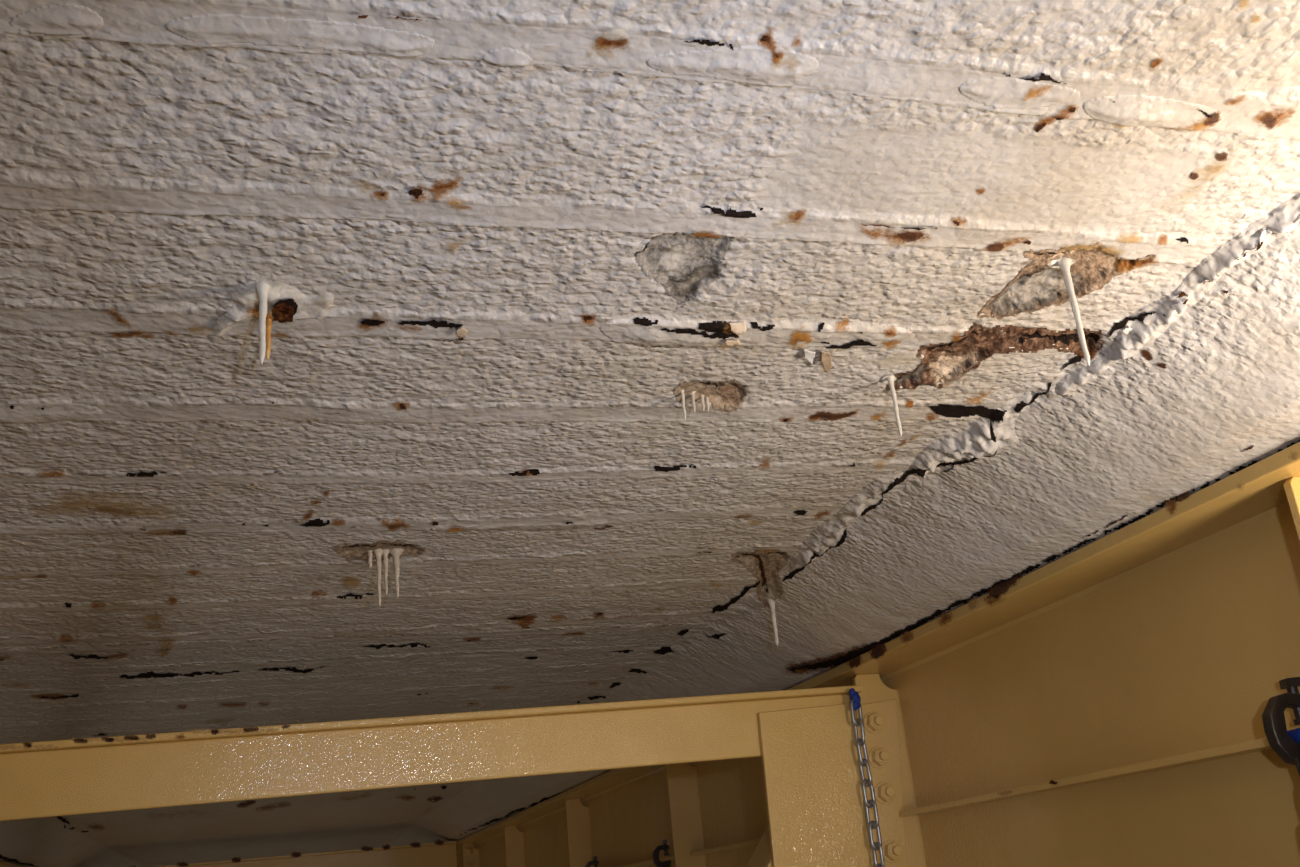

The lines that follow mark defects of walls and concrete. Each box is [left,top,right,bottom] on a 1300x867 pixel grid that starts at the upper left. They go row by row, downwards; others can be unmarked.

corrosion [758,29,800,64]
crack [1006,73,1066,84]
corrosion [1178,96,1244,131]
corrosion [1256,109,1295,129]
corrosion [408,178,471,210]
crack [701,205,763,218]
corrosion [863,221,937,244]
spalling [636,232,731,303]
spalling [880,242,1158,391]
spalling [674,379,748,420]
crack [577,220,1300,703]
spalling [332,540,426,607]